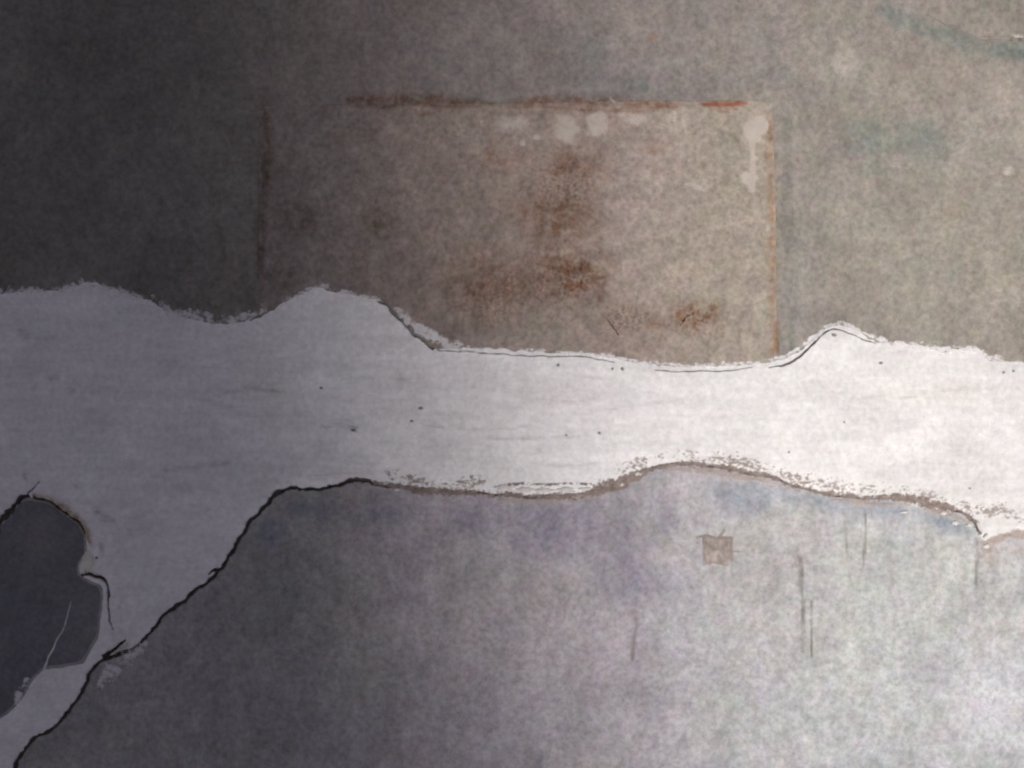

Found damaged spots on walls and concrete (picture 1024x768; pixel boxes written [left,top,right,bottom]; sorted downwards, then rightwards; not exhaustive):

crack [376,301,615,363]
crack [655,328,874,372]
spalling [373,450,1024,552]
spalling [0,501,100,716]